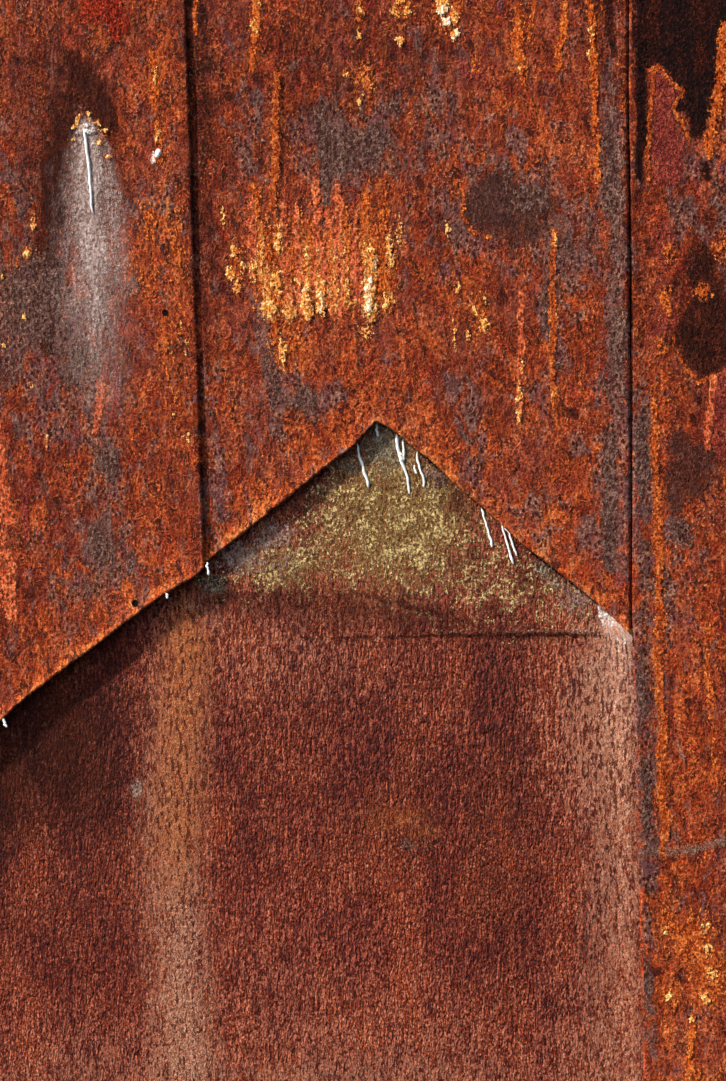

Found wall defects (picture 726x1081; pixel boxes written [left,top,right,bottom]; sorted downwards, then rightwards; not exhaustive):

leakage [76,123,104,303]
corrosion [0,0,631,722]
leakage [454,0,726,572]
corrosion [629,0,726,1081]